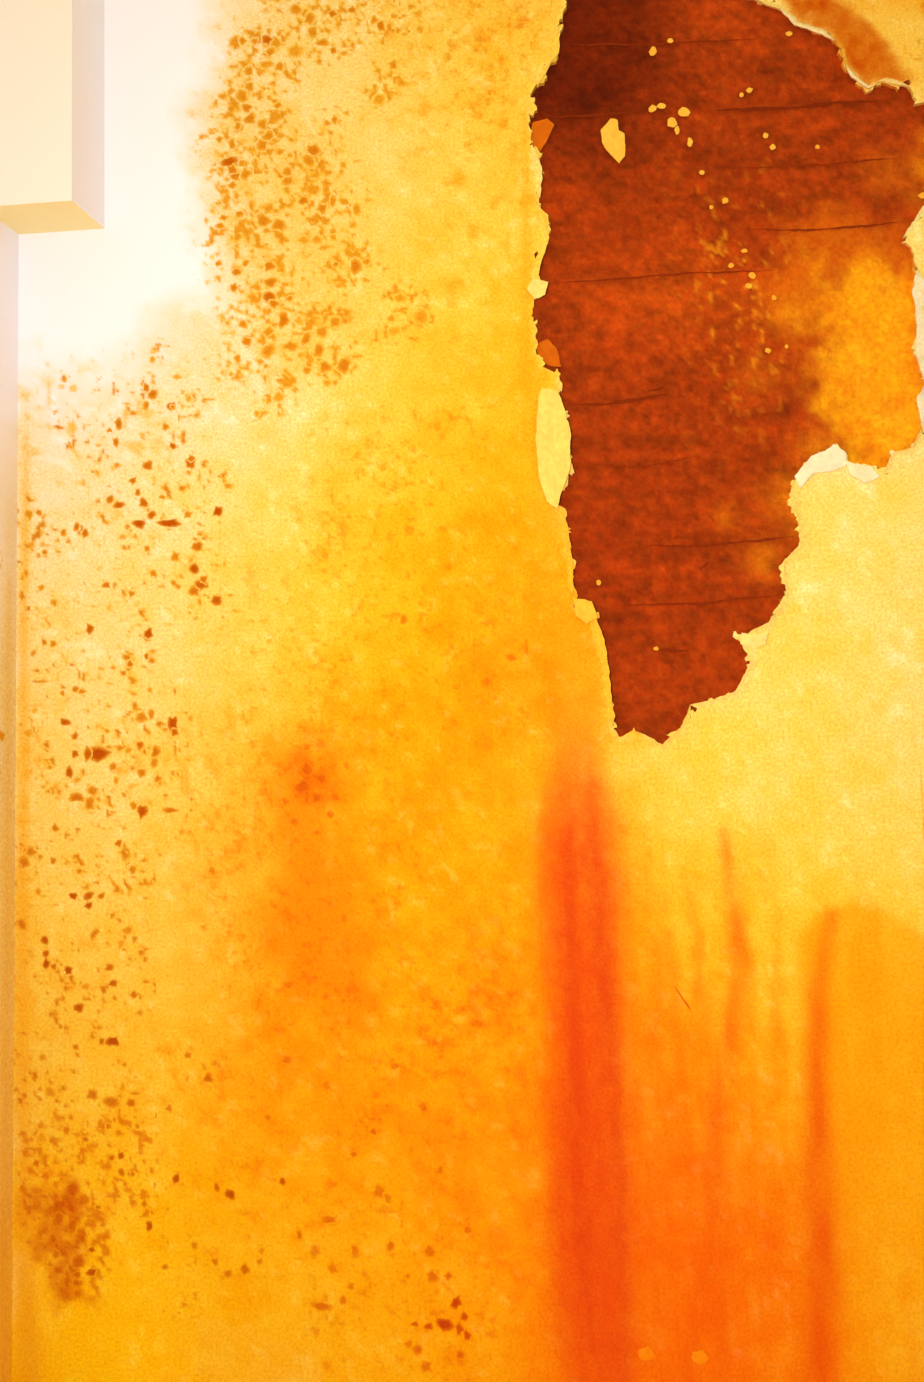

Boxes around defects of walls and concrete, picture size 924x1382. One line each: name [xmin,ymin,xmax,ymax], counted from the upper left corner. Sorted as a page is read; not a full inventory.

corrosion [808,0,906,66]
flaking render [510,0,924,768]
corrosion [516,699,662,1382]
corrosion [787,902,856,1382]